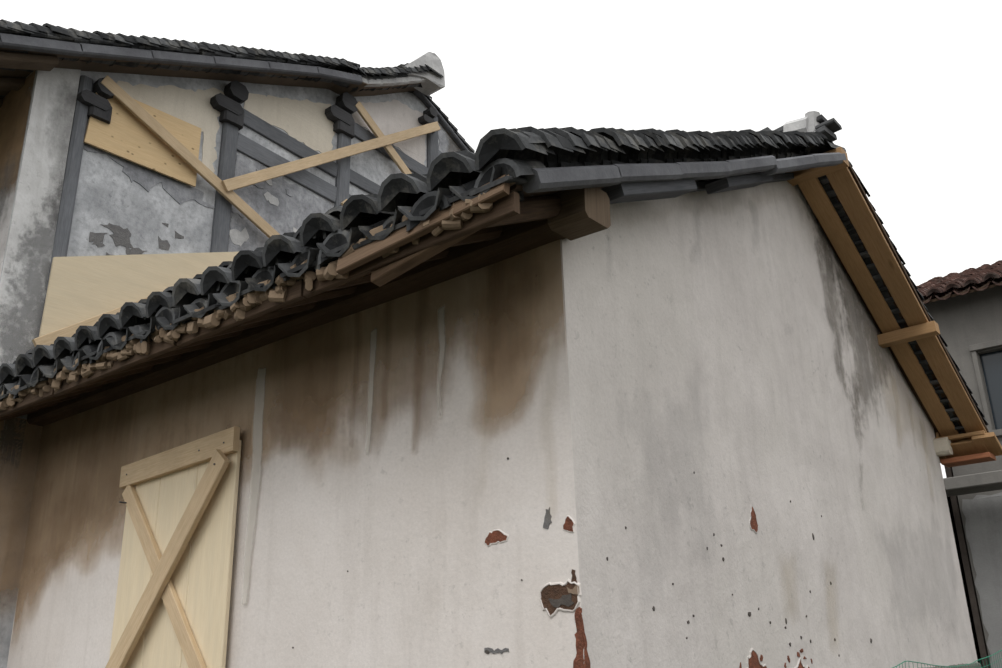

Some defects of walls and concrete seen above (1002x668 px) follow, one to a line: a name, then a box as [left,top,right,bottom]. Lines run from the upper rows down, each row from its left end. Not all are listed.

peeling [83,144,214,208]
peeling [253,179,294,206]
flaking render [89,223,145,255]
flaking render [158,223,184,250]
peeling [229,209,249,247]
damp [0,239,564,623]
spalling [749,505,758,534]
spalling [484,529,509,547]
spalling [739,648,768,668]
spalling [784,636,813,668]